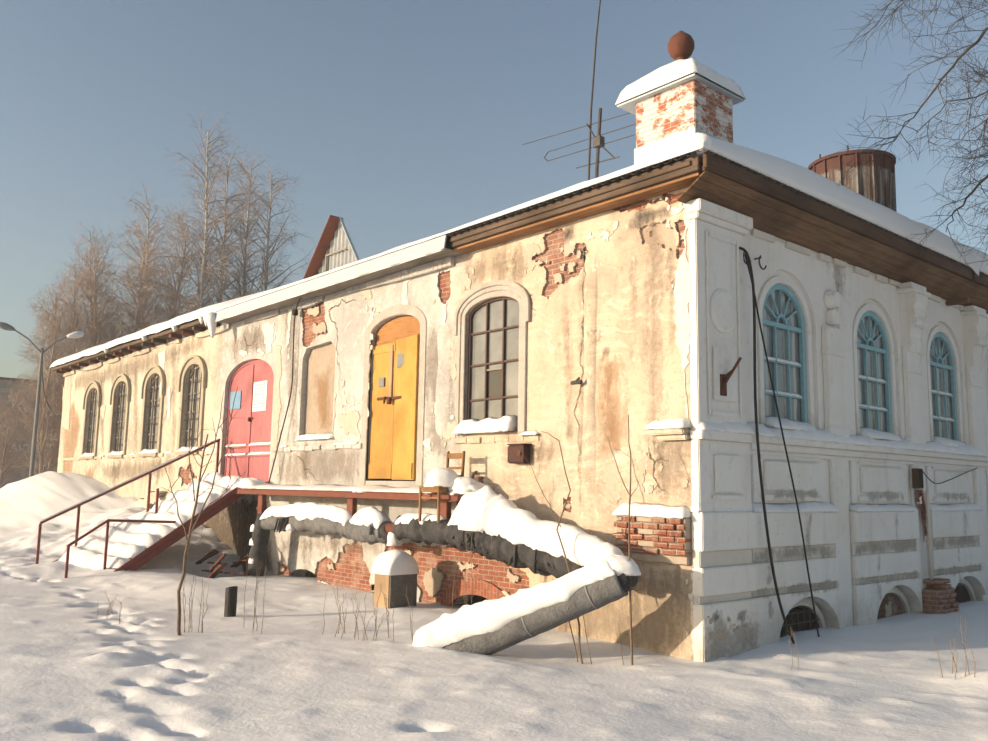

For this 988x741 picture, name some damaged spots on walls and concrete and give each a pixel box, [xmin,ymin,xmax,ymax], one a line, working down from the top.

flaking render [431,268,451,326]
flaking render [525,193,692,419]
flaking render [239,301,328,476]
flaking render [180,464,197,484]
crack [649,453,668,491]
flaking render [316,542,372,592]
flaking render [386,541,530,603]